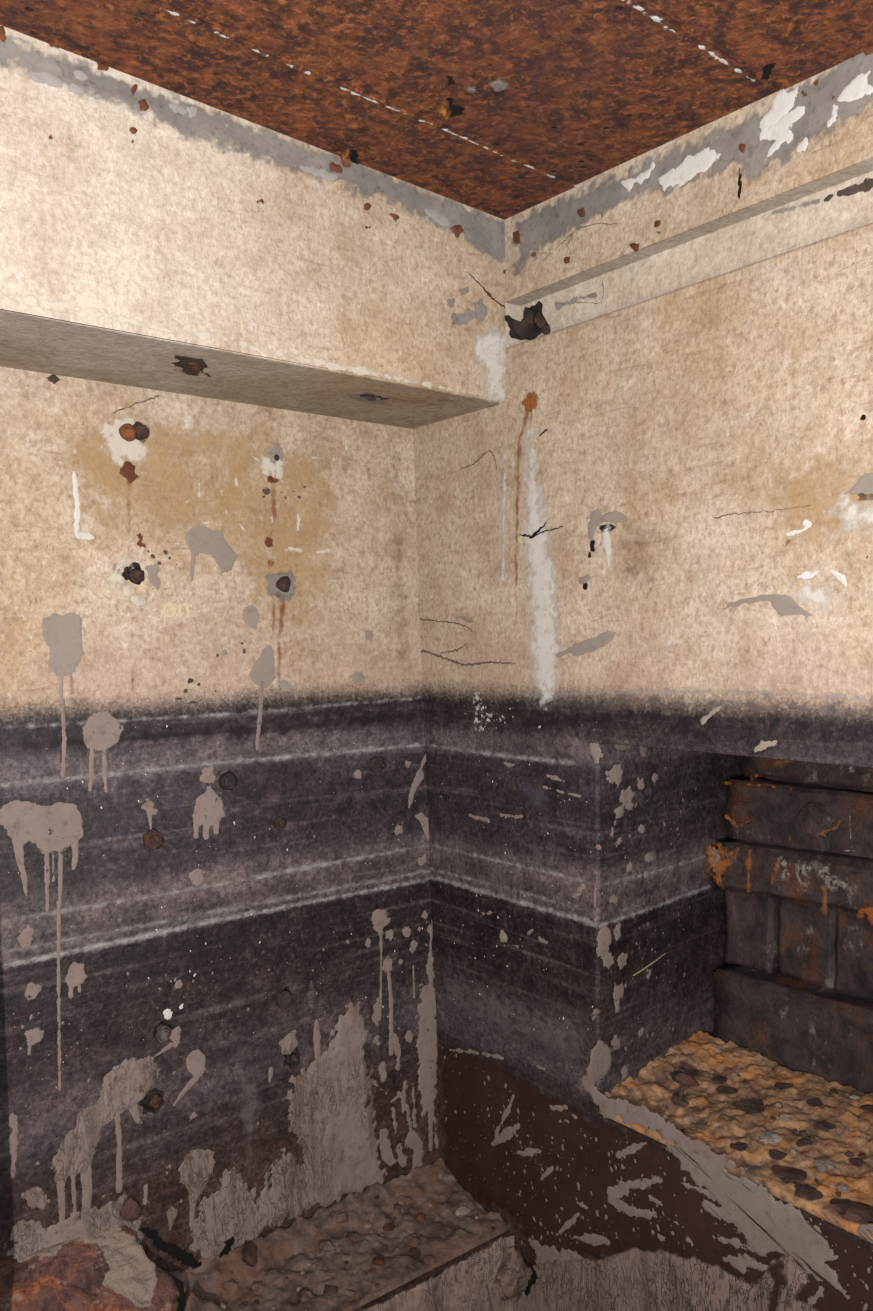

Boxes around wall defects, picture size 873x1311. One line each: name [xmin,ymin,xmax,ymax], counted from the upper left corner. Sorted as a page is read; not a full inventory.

corrosion [438,76,508,121]
peeling [0,26,873,275]
spalling [447,288,492,325]
peeling [556,293,596,310]
corrosion [517,392,538,458]
spalling [840,473,873,529]
leakage [121,428,771,772]
leakage [256,848,405,879]
leakage [4,856,710,966]
corrosion [706,843,751,892]
corrosion [772,857,847,913]
leakage [444,1047,873,1311]